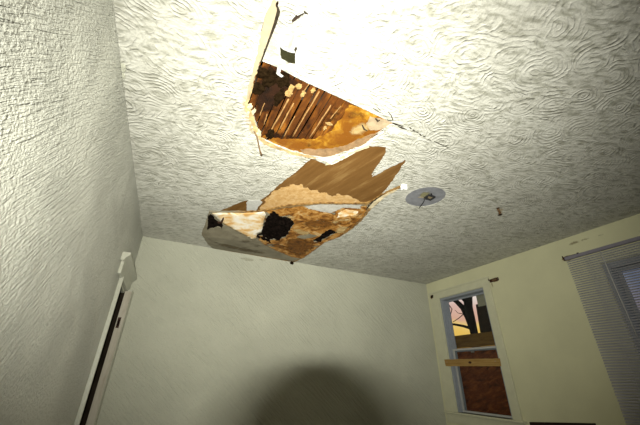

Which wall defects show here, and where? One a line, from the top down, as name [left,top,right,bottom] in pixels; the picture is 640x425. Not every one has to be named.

peeling [246,0,280,101]
crack [373,107,448,148]
peeling [221,139,405,211]
damp [259,206,367,258]